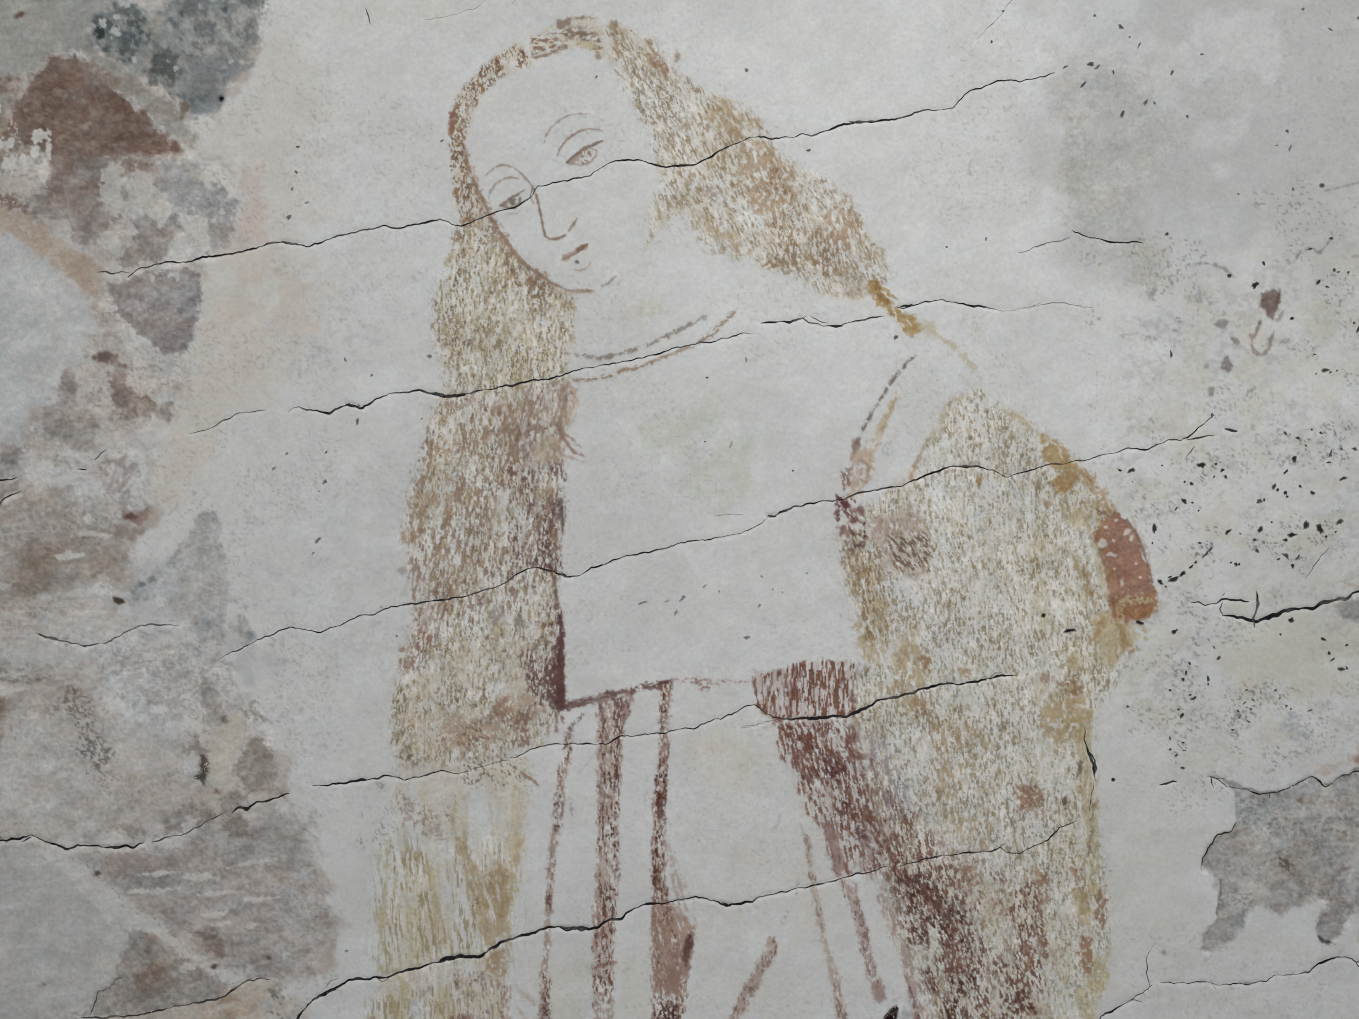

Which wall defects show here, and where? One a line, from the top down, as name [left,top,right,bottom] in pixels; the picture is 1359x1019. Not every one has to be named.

crack [97,72,1055,277]
crack [194,299,1093,433]
flaking render [7,508,259,651]
crack [219,415,1238,659]
crack [1191,548,1359,627]
peeling [0,632,120,783]
spalling [0,667,349,1019]
crack [0,672,1016,858]
crack [296,731,1097,1019]
spalling [1199,767,1359,969]
crack [81,977,269,1019]
crack [1099,946,1359,1019]